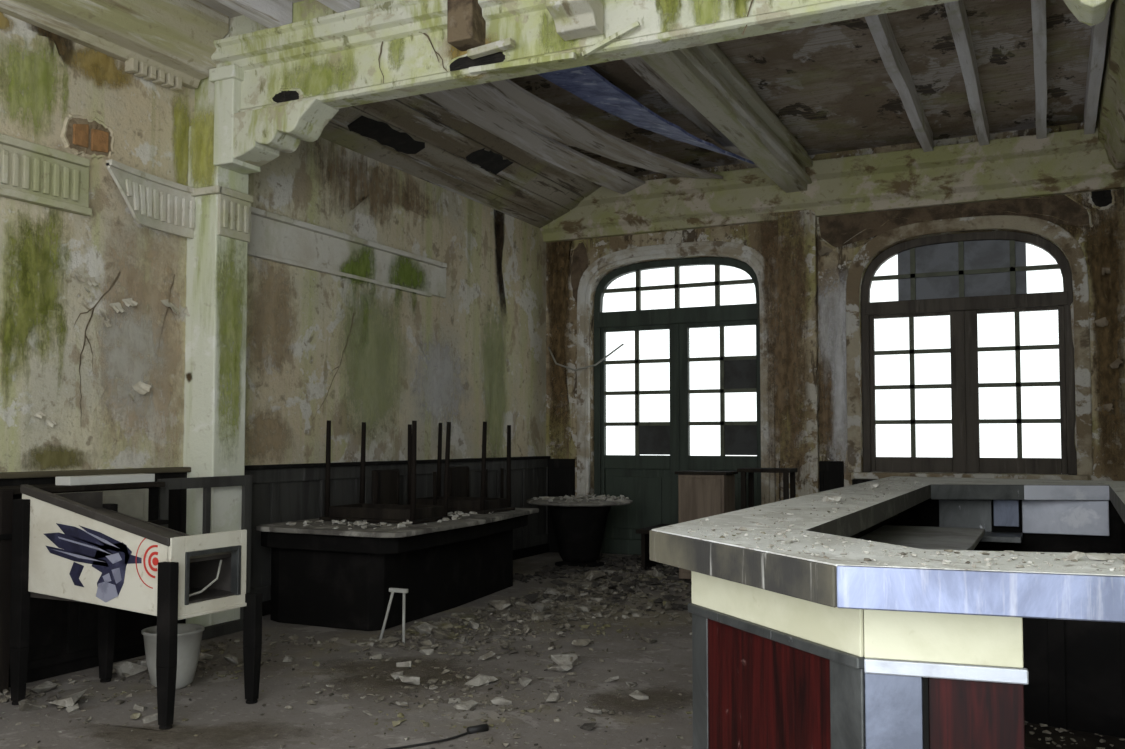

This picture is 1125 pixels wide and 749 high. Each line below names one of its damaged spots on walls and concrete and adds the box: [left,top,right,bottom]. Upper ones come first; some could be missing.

water stain [31,24,73,112]
flaking render [60,114,114,161]
flaking render [569,240,590,305]
crack [73,272,121,414]